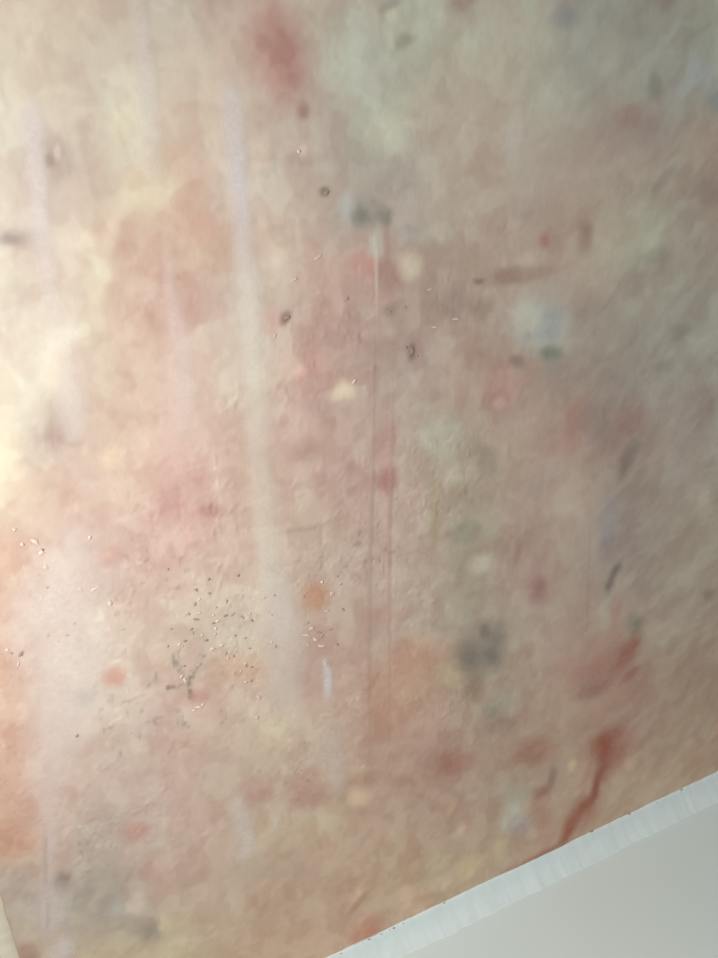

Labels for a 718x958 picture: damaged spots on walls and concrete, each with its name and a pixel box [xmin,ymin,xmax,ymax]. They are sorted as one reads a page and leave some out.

water stain [166,578,339,712]
rust [519,728,625,866]